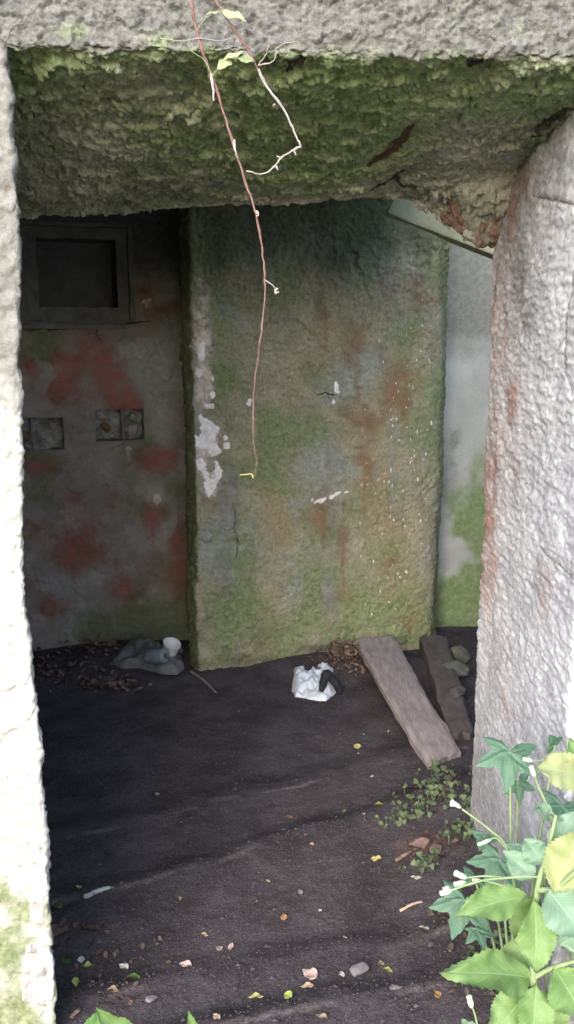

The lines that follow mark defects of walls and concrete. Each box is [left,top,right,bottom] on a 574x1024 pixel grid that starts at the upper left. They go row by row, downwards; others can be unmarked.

spalling [411,190,505,248]
peeling [195,341,230,498]